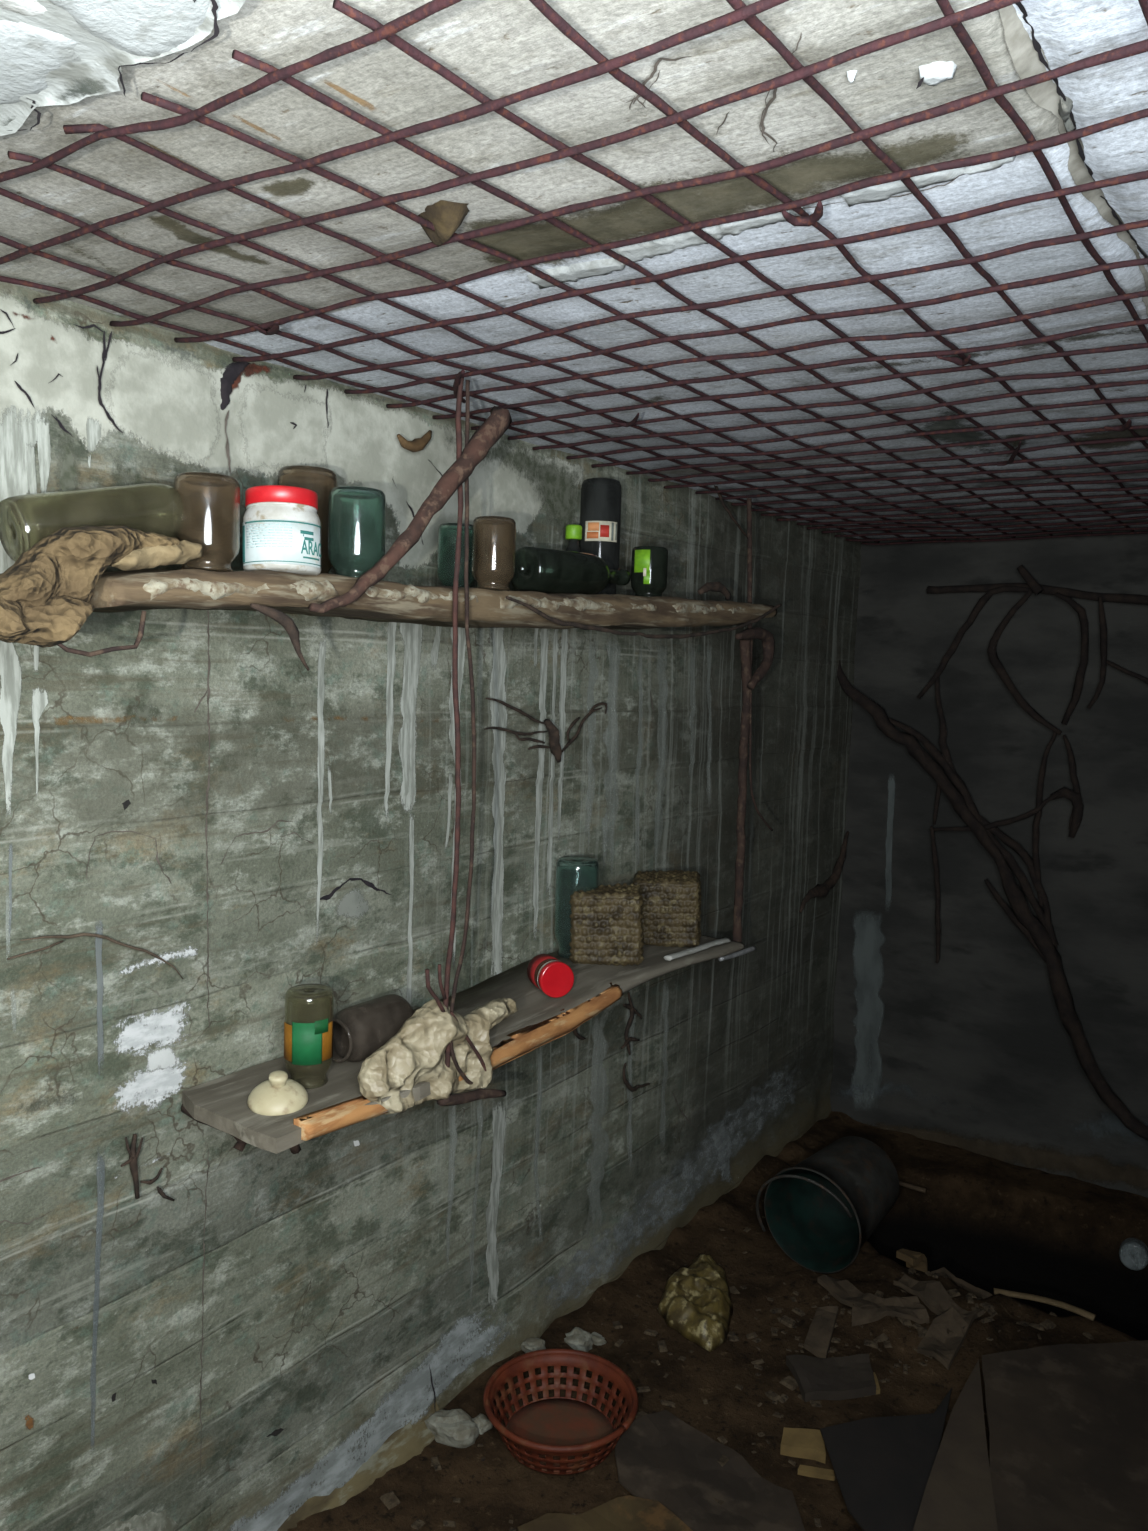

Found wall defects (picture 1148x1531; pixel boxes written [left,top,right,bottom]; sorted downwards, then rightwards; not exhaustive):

corrosion [325,82,374,110]
water stain [0,406,101,501]
corrosion [232,363,269,390]
corrosion [253,321,279,335]
spalling [0,0,1148,570]
water stain [0,640,48,816]
crack [194,610,314,1026]
water stain [384,622,466,1004]
water stain [490,628,507,976]
crack [0,1167,41,1182]
crack [199,1149,210,1473]
water stain [231,1101,510,1531]